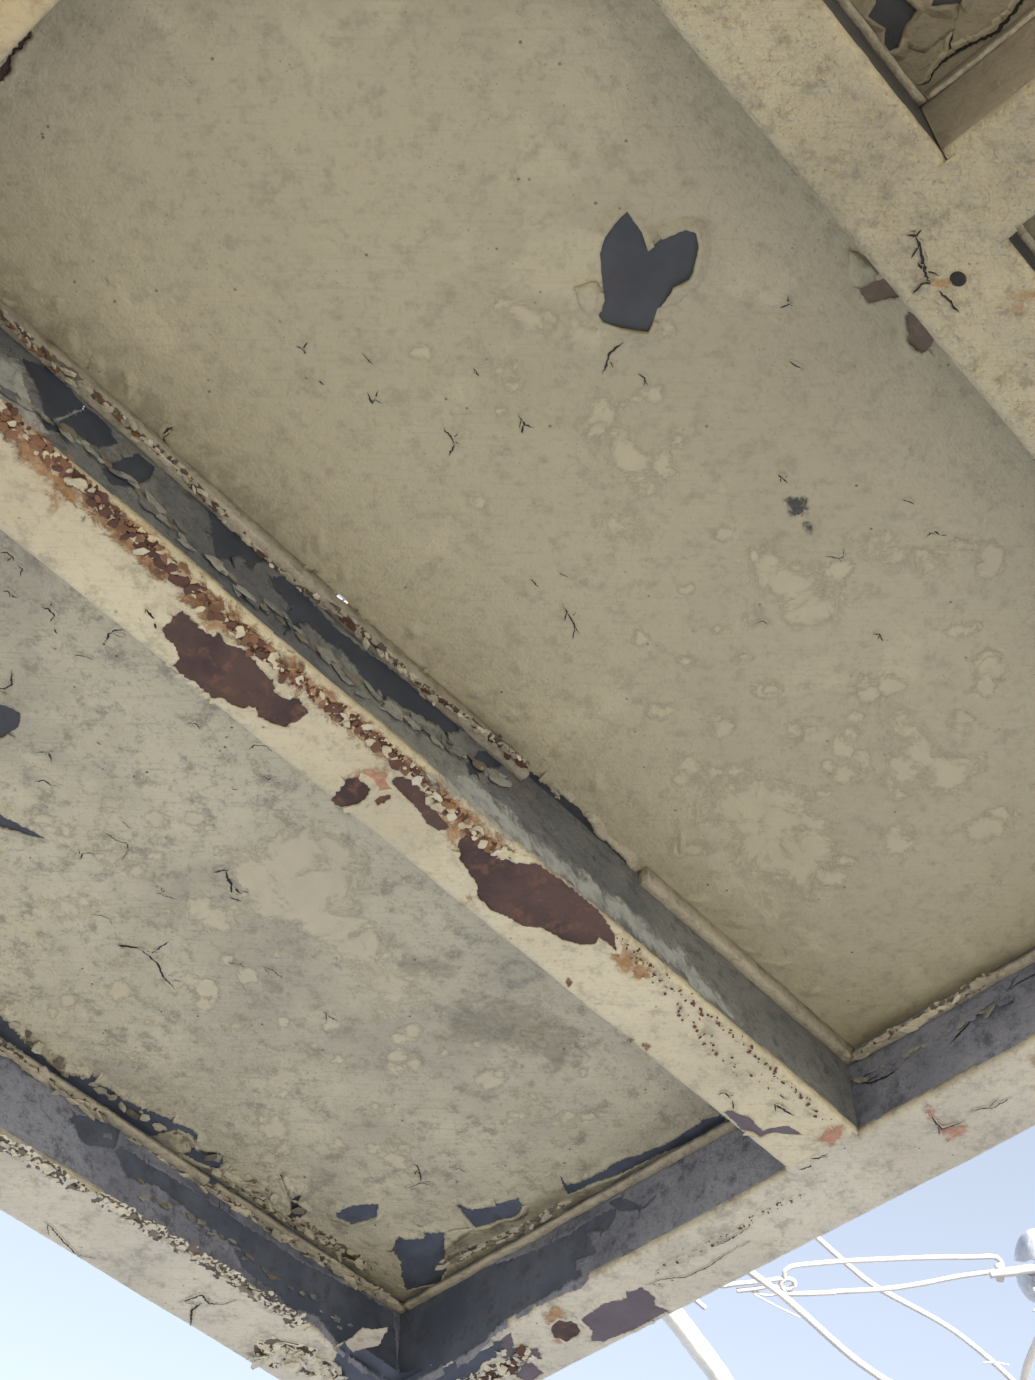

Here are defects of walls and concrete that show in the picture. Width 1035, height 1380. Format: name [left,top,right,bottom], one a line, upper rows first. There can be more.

peeling [0,26,43,88]
peeling [858,0,973,63]
crack [918,0,1024,85]
peeling [573,200,712,344]
damp [581,385,685,497]
rust [0,401,272,648]
peeling [0,308,641,955]
damp [749,532,1004,626]
rust [271,650,515,853]
damp [671,675,986,901]
peeling [850,972,1013,1083]
peeling [0,1003,814,1380]